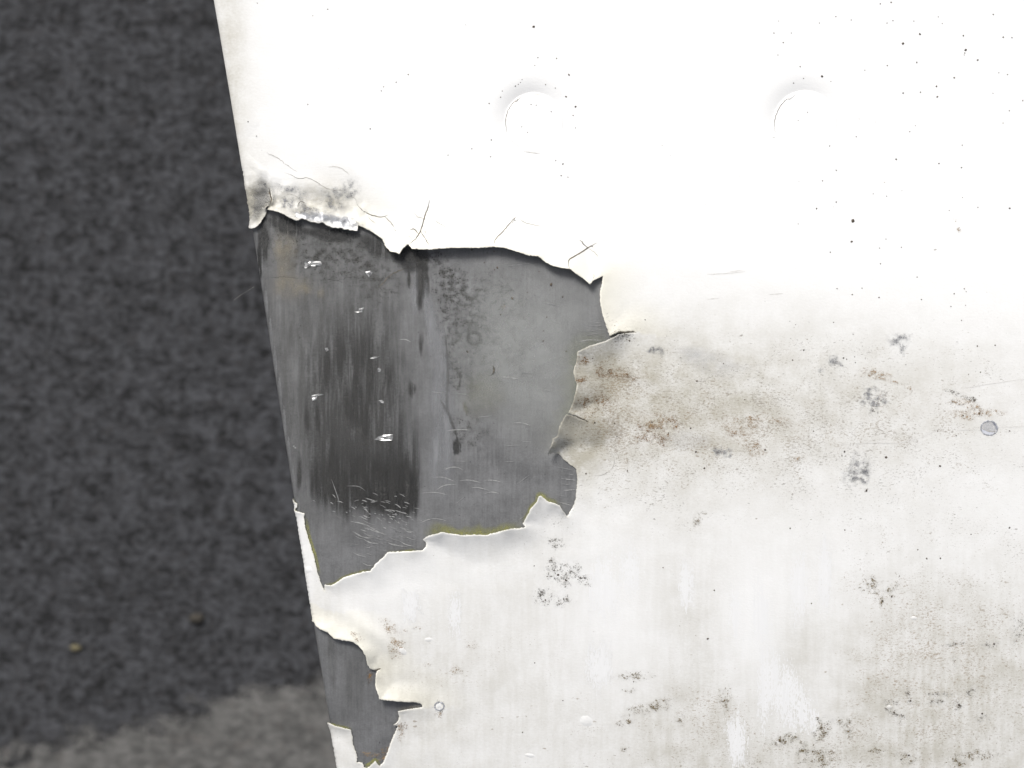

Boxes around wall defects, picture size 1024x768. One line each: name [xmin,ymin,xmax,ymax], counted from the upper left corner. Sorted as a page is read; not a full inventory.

peeling [246,169,683,768]
water stain [723,575,820,767]